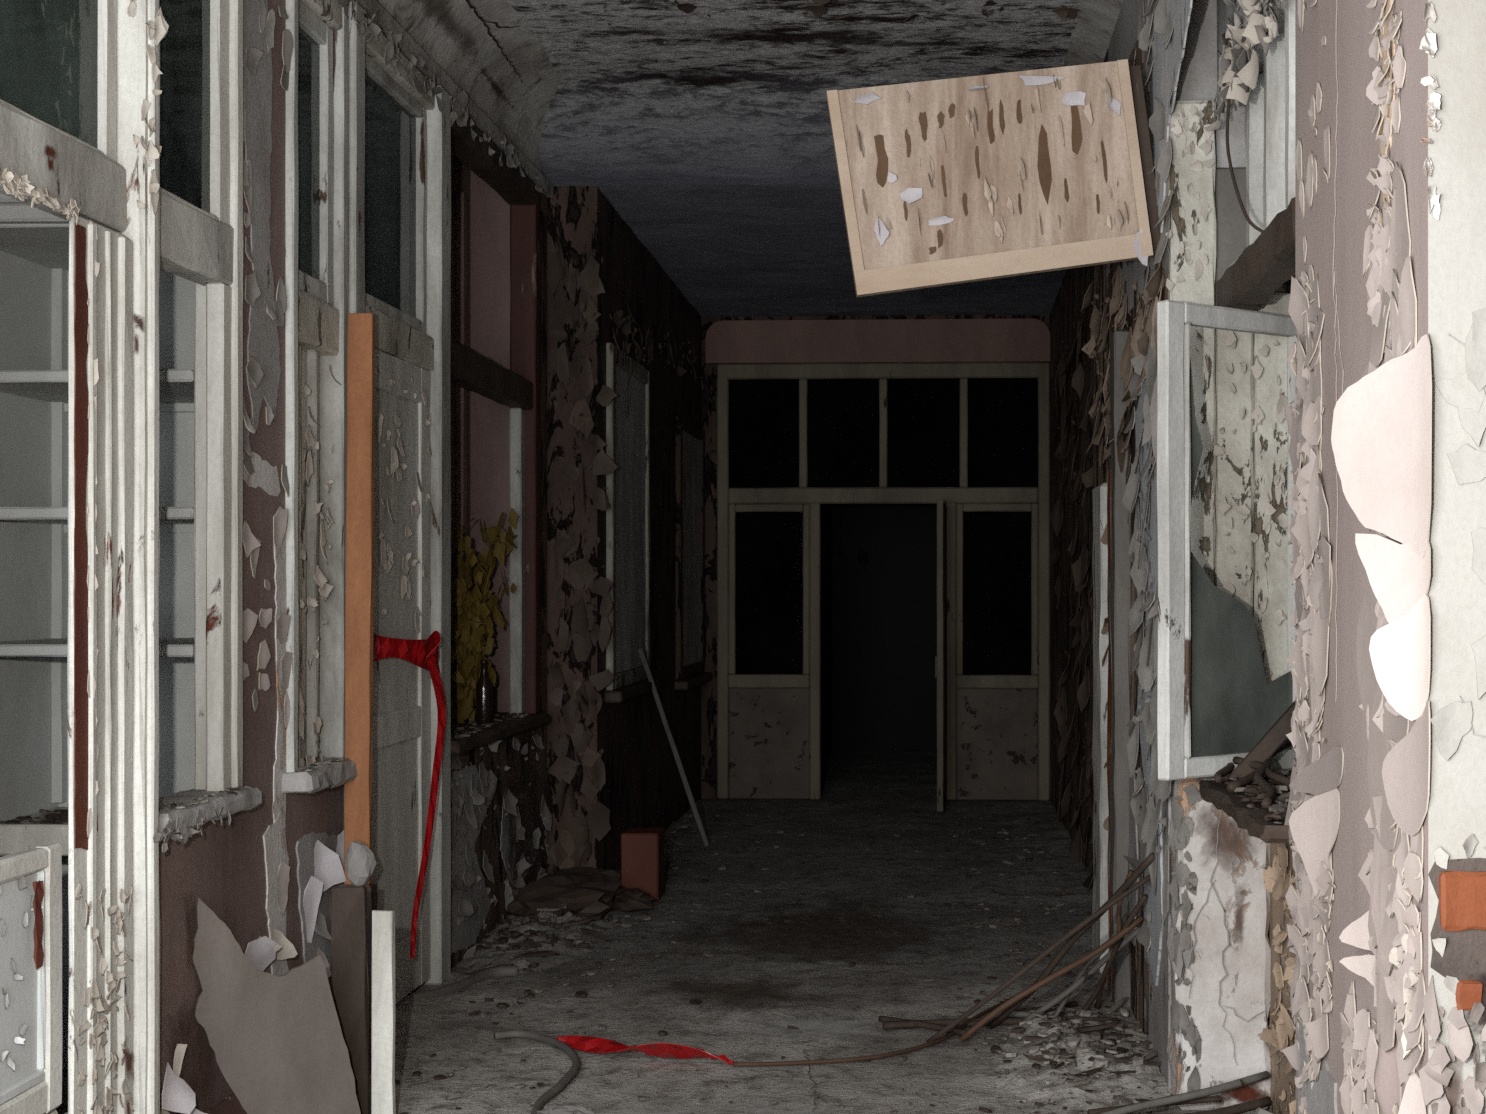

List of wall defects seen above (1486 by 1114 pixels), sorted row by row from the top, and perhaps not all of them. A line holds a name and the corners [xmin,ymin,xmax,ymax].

leakage [419,0,474,50]
peeling [663,0,711,17]
leakage [597,29,959,47]
peeling [982,0,1004,18]
leakage [635,73,766,89]
peeling [1018,74,1121,145]
peeling [242,0,346,981]
flaking render [1050,0,1317,1092]
peeling [1213,0,1486,1114]
peeling [451,238,706,959]
peeling [153,807,231,853]
peeling [160,1044,207,1114]